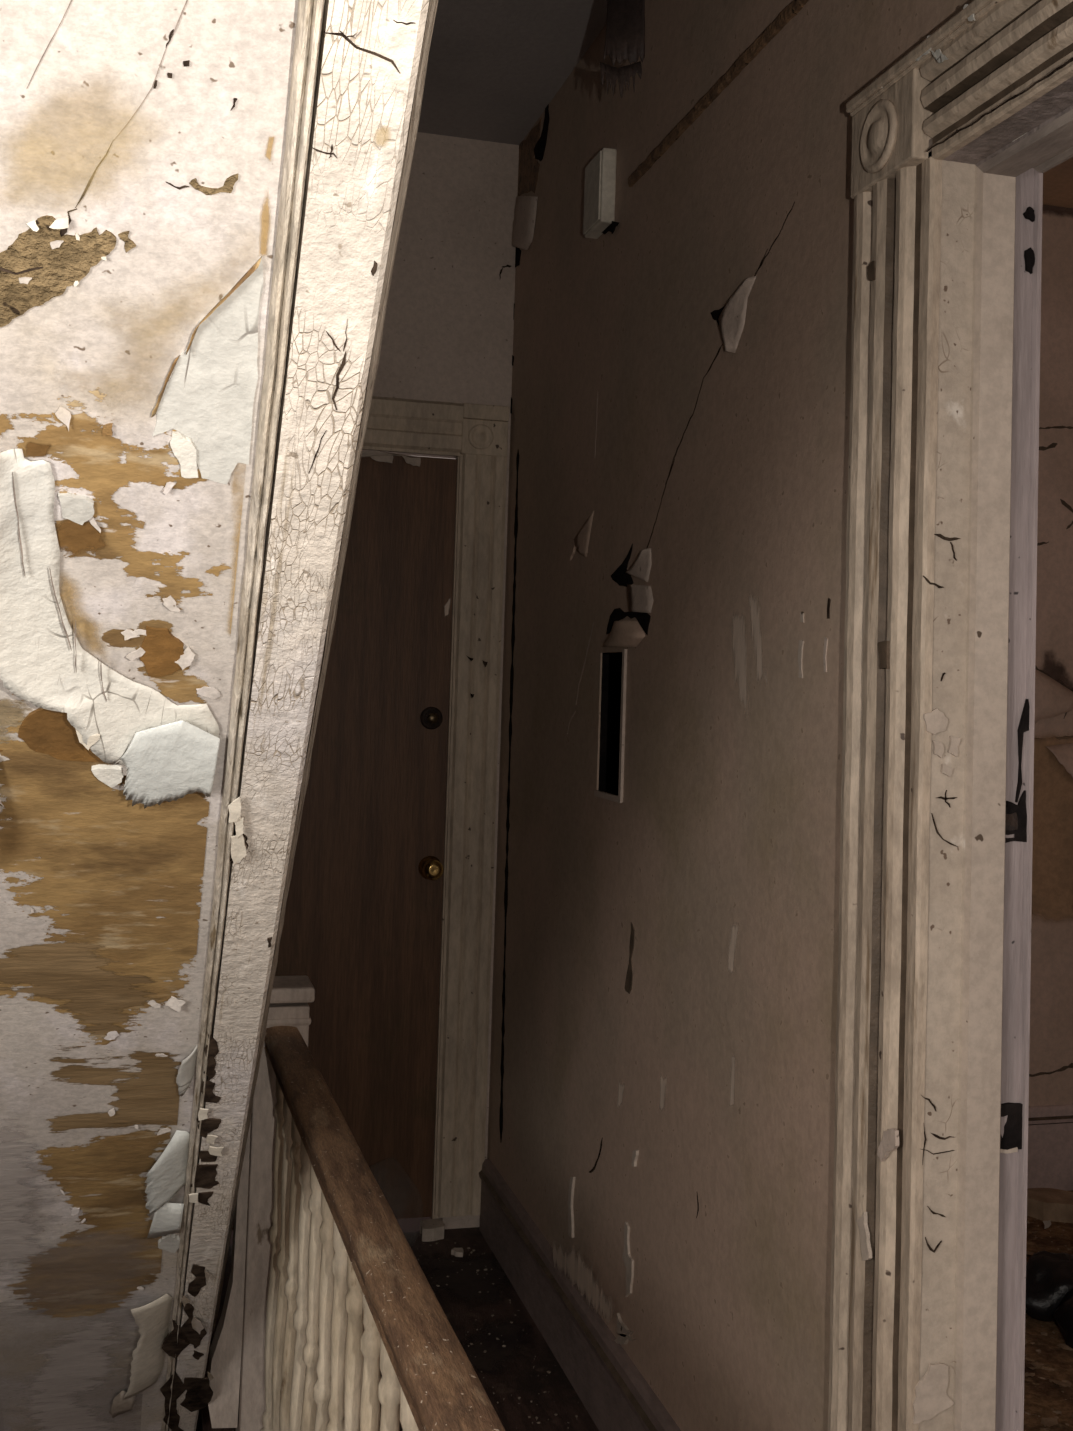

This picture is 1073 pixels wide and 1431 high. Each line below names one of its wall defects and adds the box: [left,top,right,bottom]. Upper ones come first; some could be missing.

crack [324,31,400,73]
crack [313,145,337,158]
flaking render [0,215,136,327]
crack [754,202,795,276]
crack [308,326,347,474]
crack [646,344,723,549]
crack [1039,426,1073,451]
crack [1037,499,1073,546]
peeling [0,255,263,1045]
peeling [6,1034,224,1431]